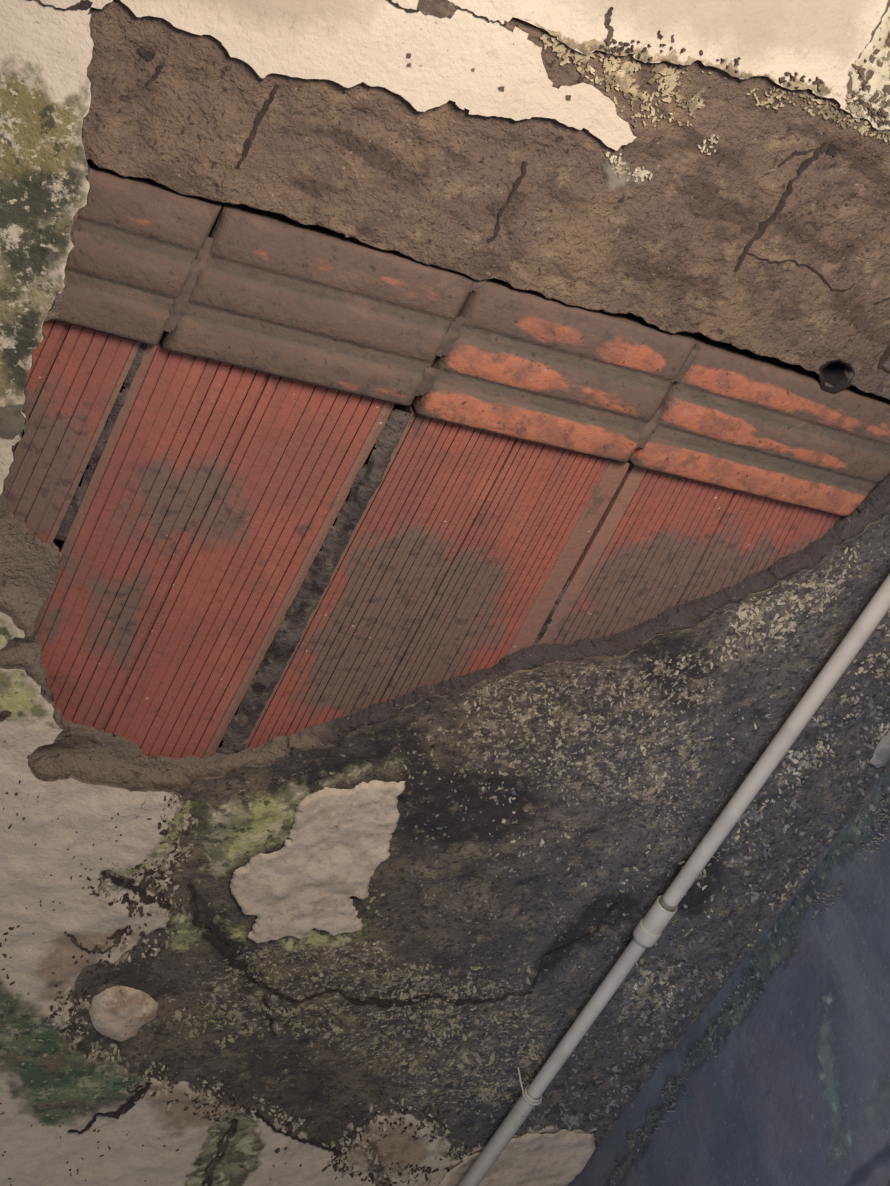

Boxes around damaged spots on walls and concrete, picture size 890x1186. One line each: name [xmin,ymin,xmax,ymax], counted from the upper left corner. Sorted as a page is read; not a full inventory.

crack [29,0,93,11]
crack [604,7,614,56]
water stain [0,63,88,405]
crack [235,85,279,169]
spalling [30,0,890,400]
crack [487,161,528,243]
water stain [605,152,653,189]
water stain [697,134,720,155]
crack [734,143,890,305]
spalling [0,342,890,792]
water stain [41,507,890,1186]
crack [67,871,622,1036]